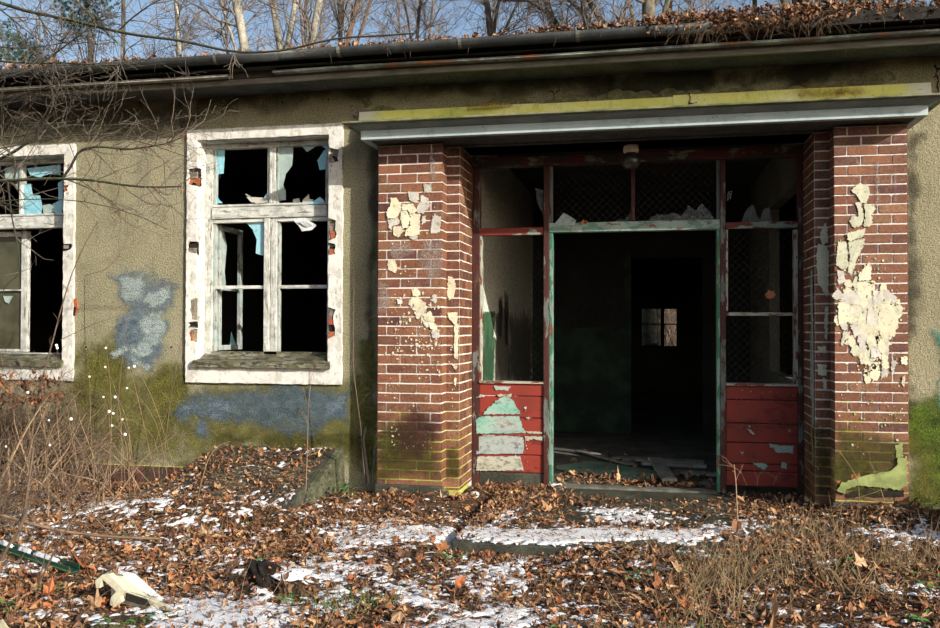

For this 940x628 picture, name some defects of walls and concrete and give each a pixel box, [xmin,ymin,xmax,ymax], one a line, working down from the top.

crack [932,64,940,93]
peeling [384,183,441,245]
leakage [908,174,918,197]
leakage [907,261,919,330]
peeling [385,259,459,407]
peeling [810,183,908,498]
peeling [476,311,542,471]
peeling [770,443,794,469]